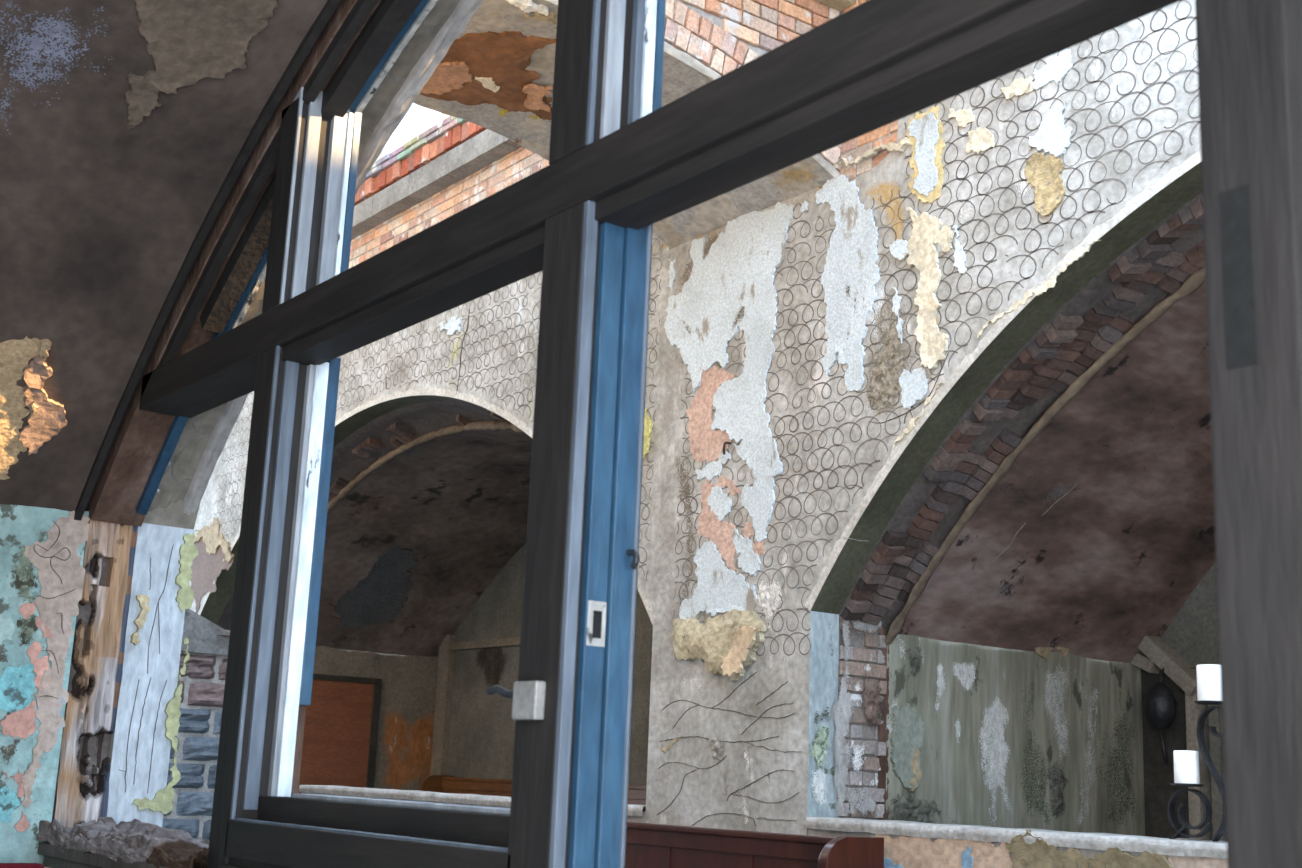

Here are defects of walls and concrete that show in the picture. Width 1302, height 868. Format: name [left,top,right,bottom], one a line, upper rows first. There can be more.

flaking render [419,0,556,120]
peeling [1000,49,1073,100]
peeling [1015,103,1072,217]
flaking render [977,240,1101,338]
flaking render [0,336,67,480]
peeling [664,106,995,619]
flaking render [175,517,235,613]
flaking render [0,601,52,740]
leakage [896,635,976,710]
leakage [979,664,1143,829]
leakage [886,789,962,824]
peeling [871,829,1228,868]